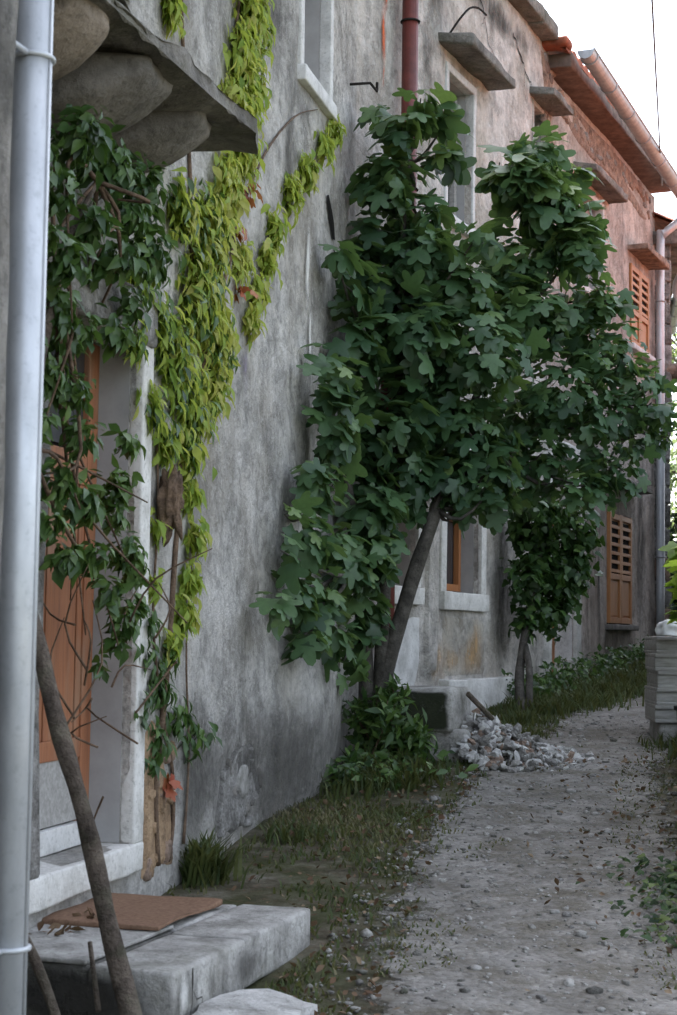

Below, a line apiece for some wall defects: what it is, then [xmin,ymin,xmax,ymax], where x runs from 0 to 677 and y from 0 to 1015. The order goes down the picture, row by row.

spalling [540,51,651,220]